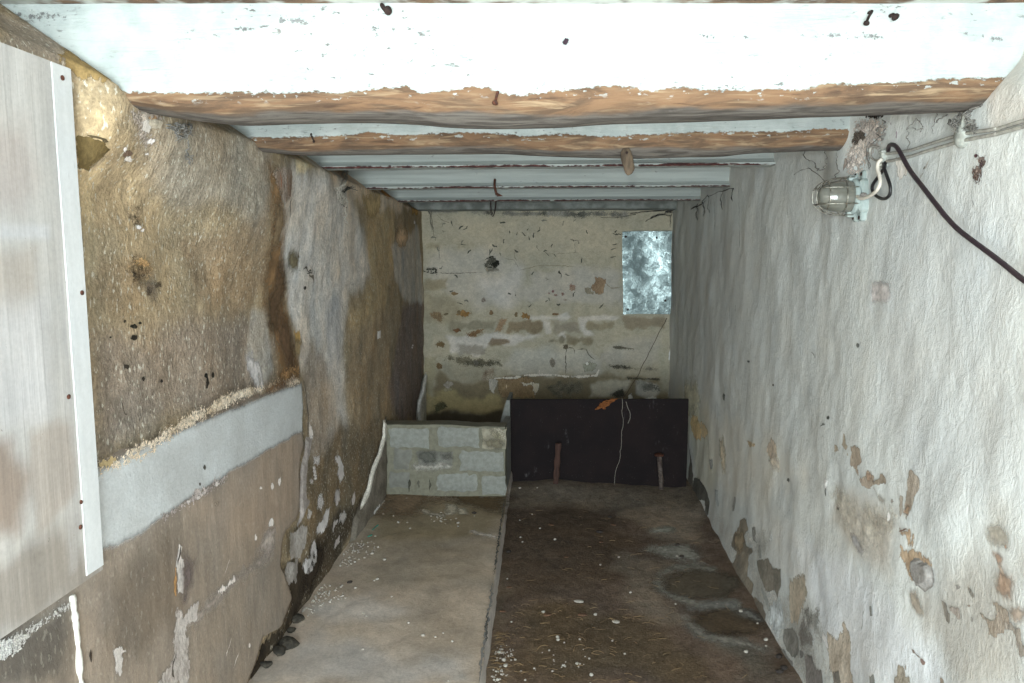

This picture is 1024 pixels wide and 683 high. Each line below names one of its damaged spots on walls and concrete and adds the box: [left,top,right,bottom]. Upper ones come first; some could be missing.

peeling [76,135,110,171]
spalling [123,108,164,162]
spalling [843,115,888,177]
damp [264,165,302,384]
peeling [585,277,618,295]
peeling [440,354,600,399]
peeling [834,434,886,489]
spalling [285,436,313,586]
peeling [684,384,853,683]
peeling [899,470,920,519]
peeling [941,585,1024,657]
peeling [894,665,910,683]